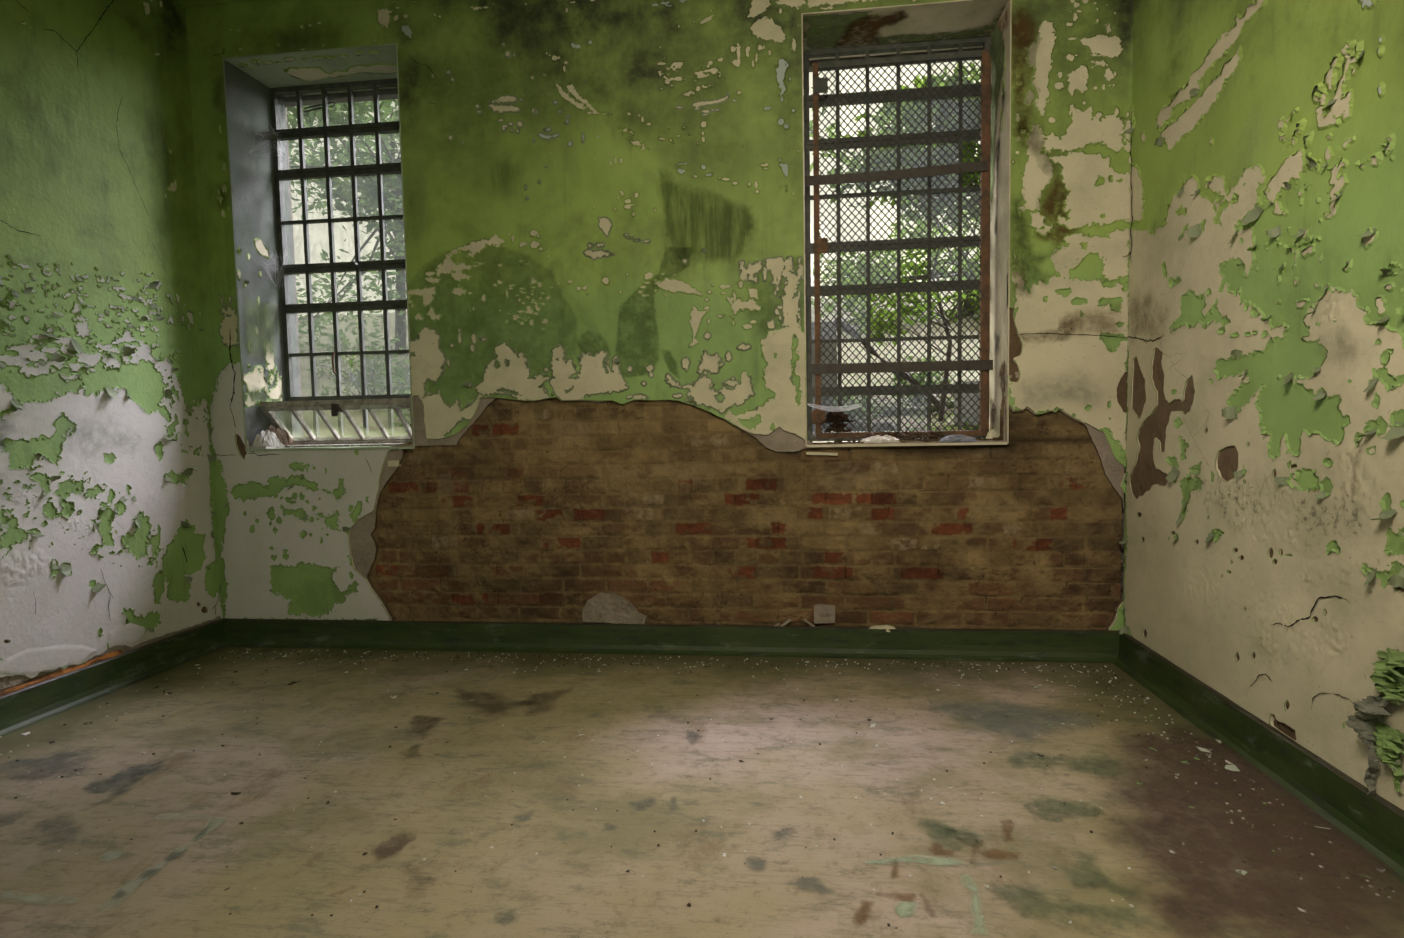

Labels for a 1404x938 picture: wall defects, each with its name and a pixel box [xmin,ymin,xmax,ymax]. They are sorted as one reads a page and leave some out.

crack [17,0,114,67]
peeling [229,0,417,81]
peeling [475,0,920,168]
peeling [1023,0,1125,125]
spalling [0,38,1404,787]
crack [1273,595,1347,630]
peeling [1374,700,1404,810]